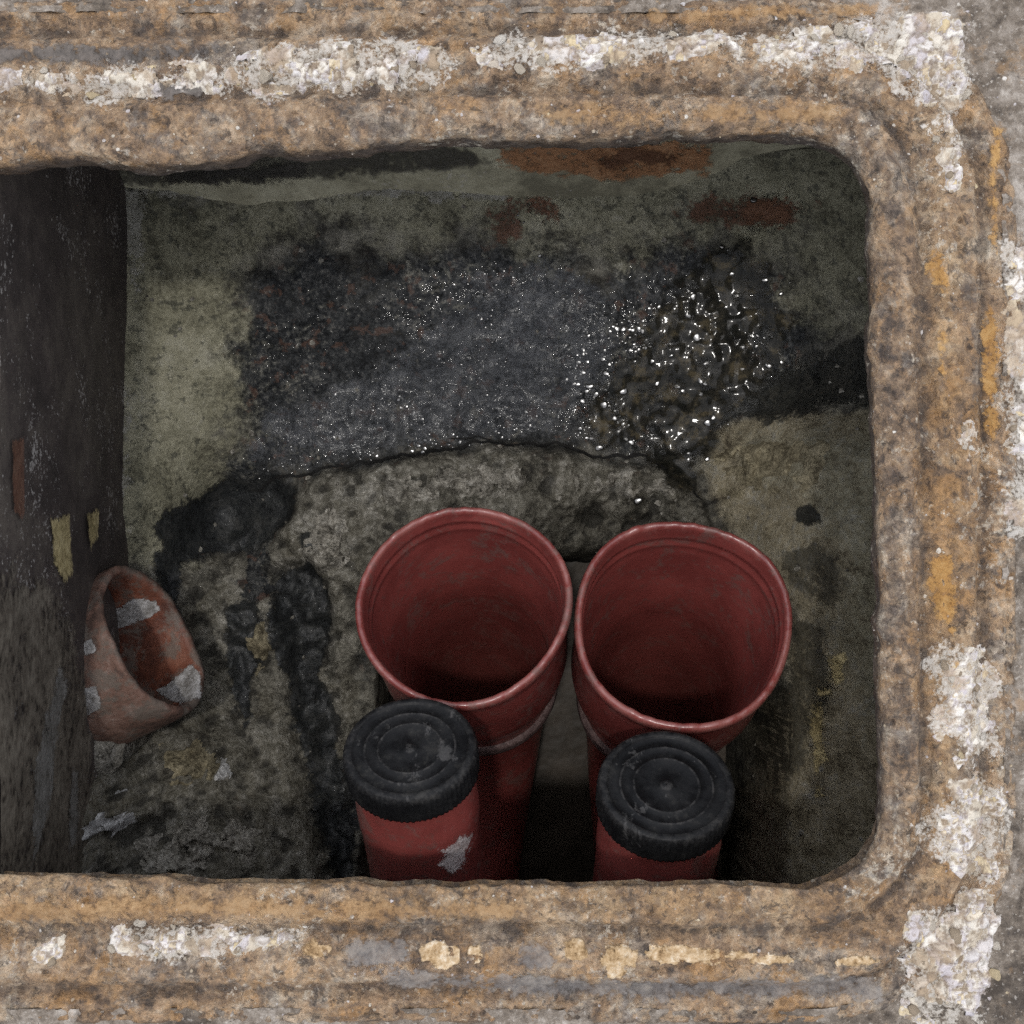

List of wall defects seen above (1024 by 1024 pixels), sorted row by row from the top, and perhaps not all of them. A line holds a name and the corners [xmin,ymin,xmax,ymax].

water stain [153,473,297,620]
crack [245,435,702,500]
water stain [585,240,869,496]
water stain [224,532,355,879]